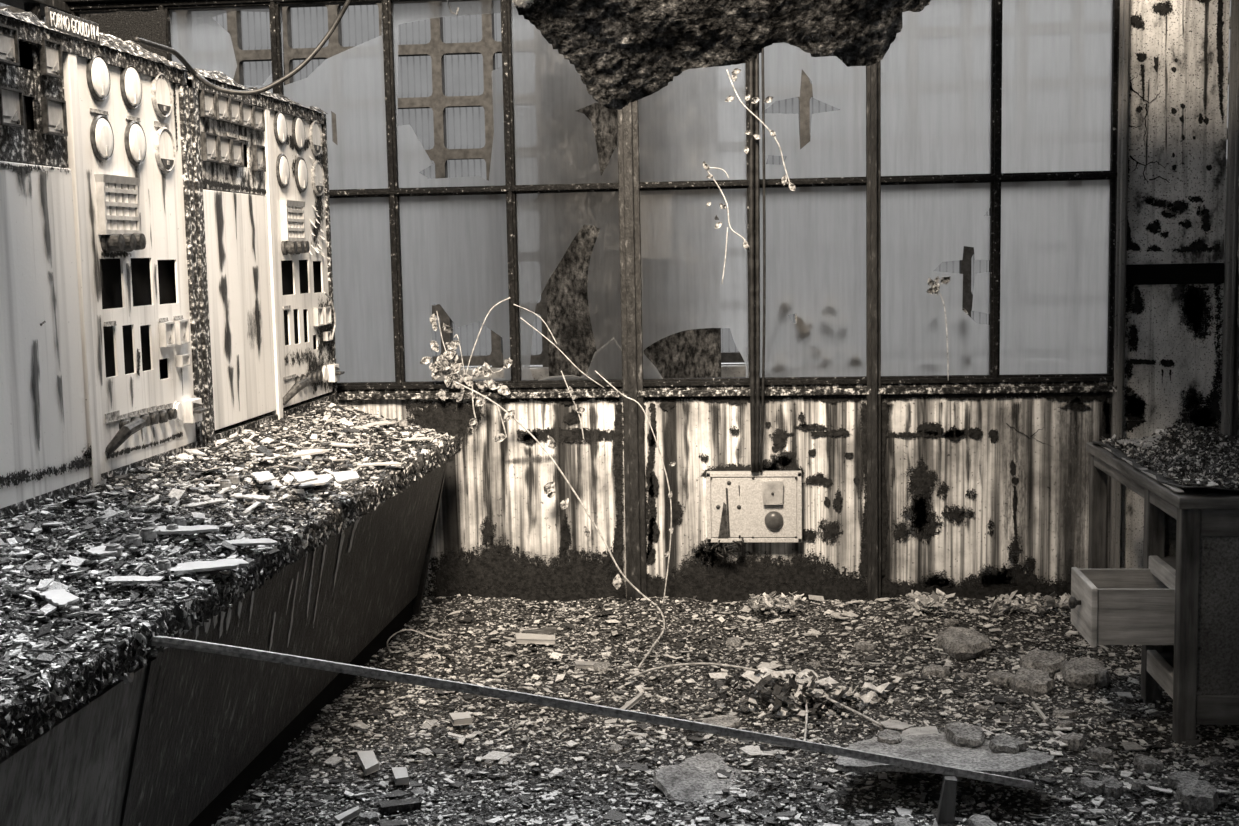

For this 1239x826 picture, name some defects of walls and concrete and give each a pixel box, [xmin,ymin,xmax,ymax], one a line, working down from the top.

damp [1129,0,1224,171]
damp [1127,196,1221,253]
damp [644,285,1147,602]
damp [1175,283,1223,434]